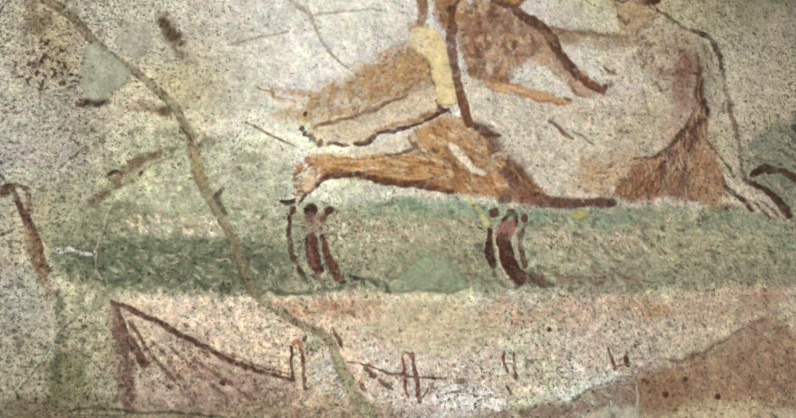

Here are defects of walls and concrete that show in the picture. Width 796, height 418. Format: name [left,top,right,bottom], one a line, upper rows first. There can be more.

crack [42,0,378,418]